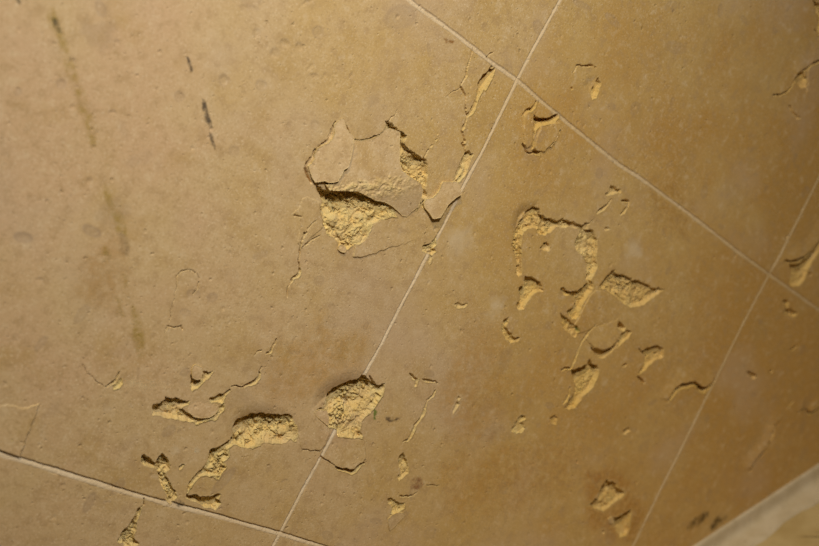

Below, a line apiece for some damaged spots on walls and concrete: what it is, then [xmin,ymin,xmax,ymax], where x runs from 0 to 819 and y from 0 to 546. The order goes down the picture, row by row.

spalling [571,62,603,103]
spalling [290,107,462,267]
spalling [500,182,666,345]
spalling [784,240,819,288]
spalling [149,364,228,427]
spalling [549,357,601,427]
spalling [636,344,665,386]
crack [666,380,716,405]
spalling [138,374,387,512]
spalling [115,498,147,546]
spalling [586,478,633,540]